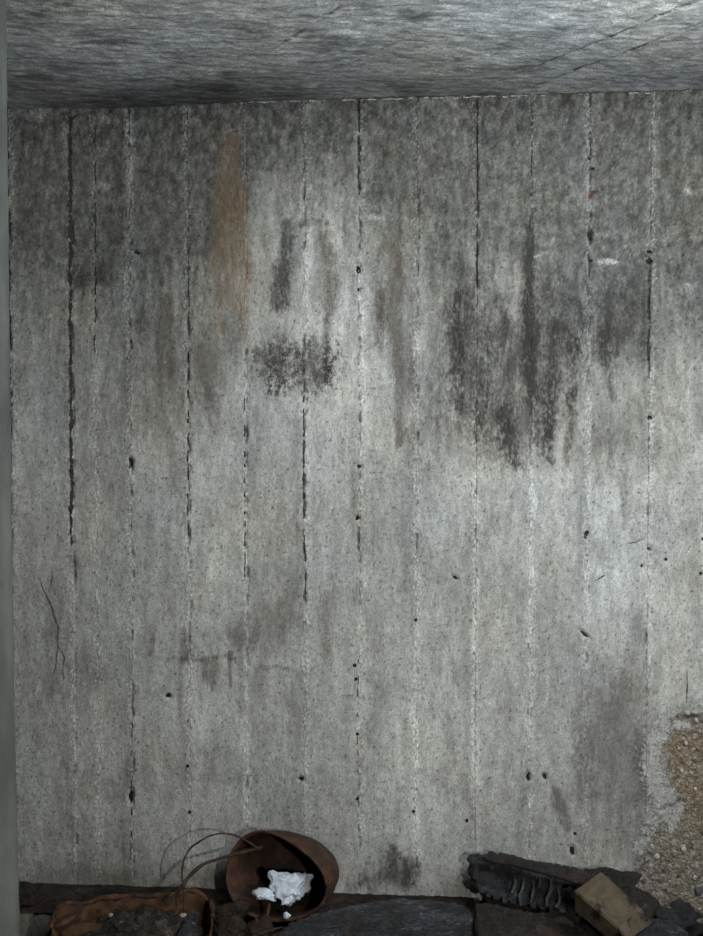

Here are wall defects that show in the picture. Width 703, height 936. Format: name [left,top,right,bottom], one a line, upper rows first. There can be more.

leakage [498,408,519,468]
leakage [524,226,554,463]
spalling [629,697,703,923]